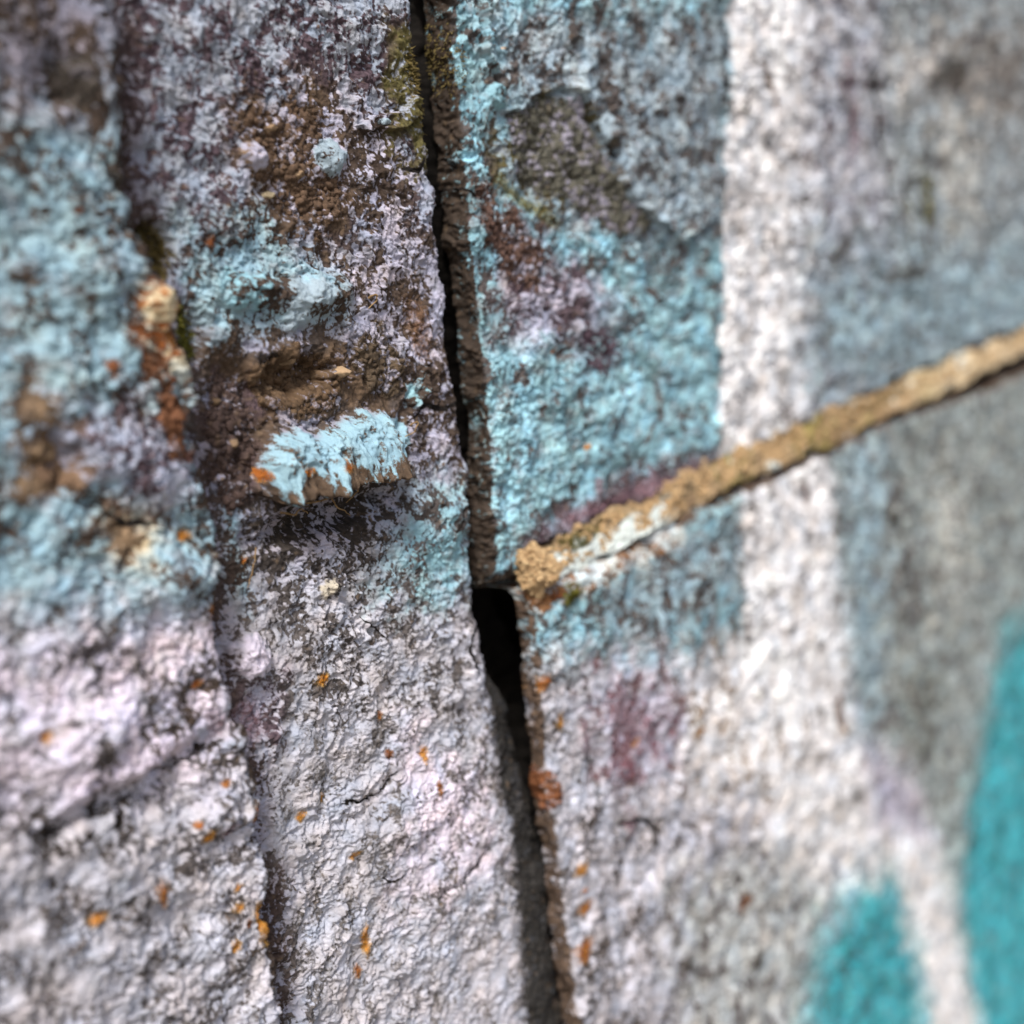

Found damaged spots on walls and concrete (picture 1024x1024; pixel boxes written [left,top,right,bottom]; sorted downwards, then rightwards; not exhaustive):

spalling [202,264,433,518]
crack [401,0,476,548]
crack [432,845,494,903]
crack [468,586,550,907]